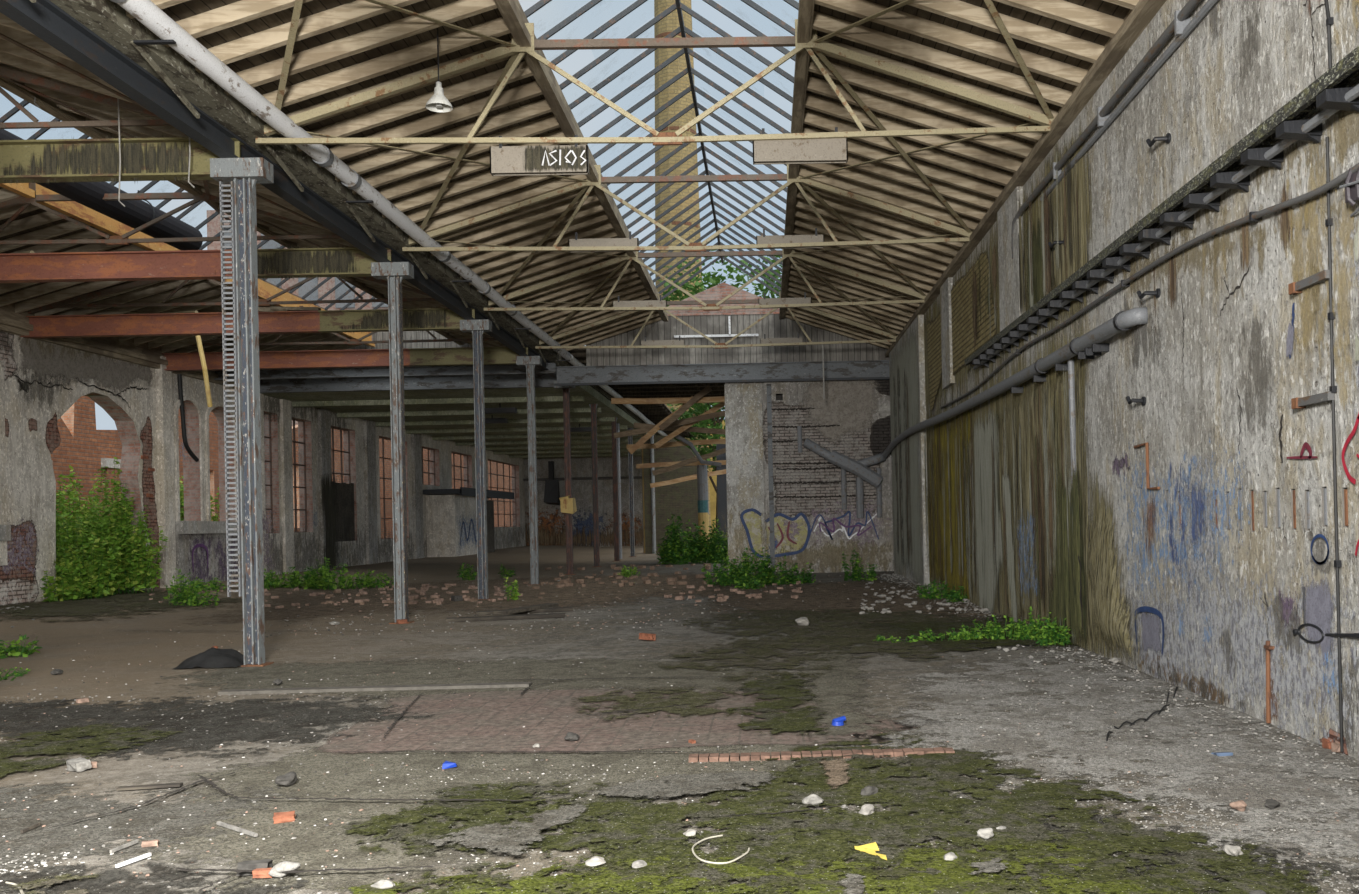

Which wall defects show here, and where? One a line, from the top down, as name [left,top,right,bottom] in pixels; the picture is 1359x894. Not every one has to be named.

water stain [1018,149,1078,312]
flaking render [0,520,39,606]
flaking render [140,416,160,589]
flaking render [762,379,891,517]
water stain [775,328,1081,622]